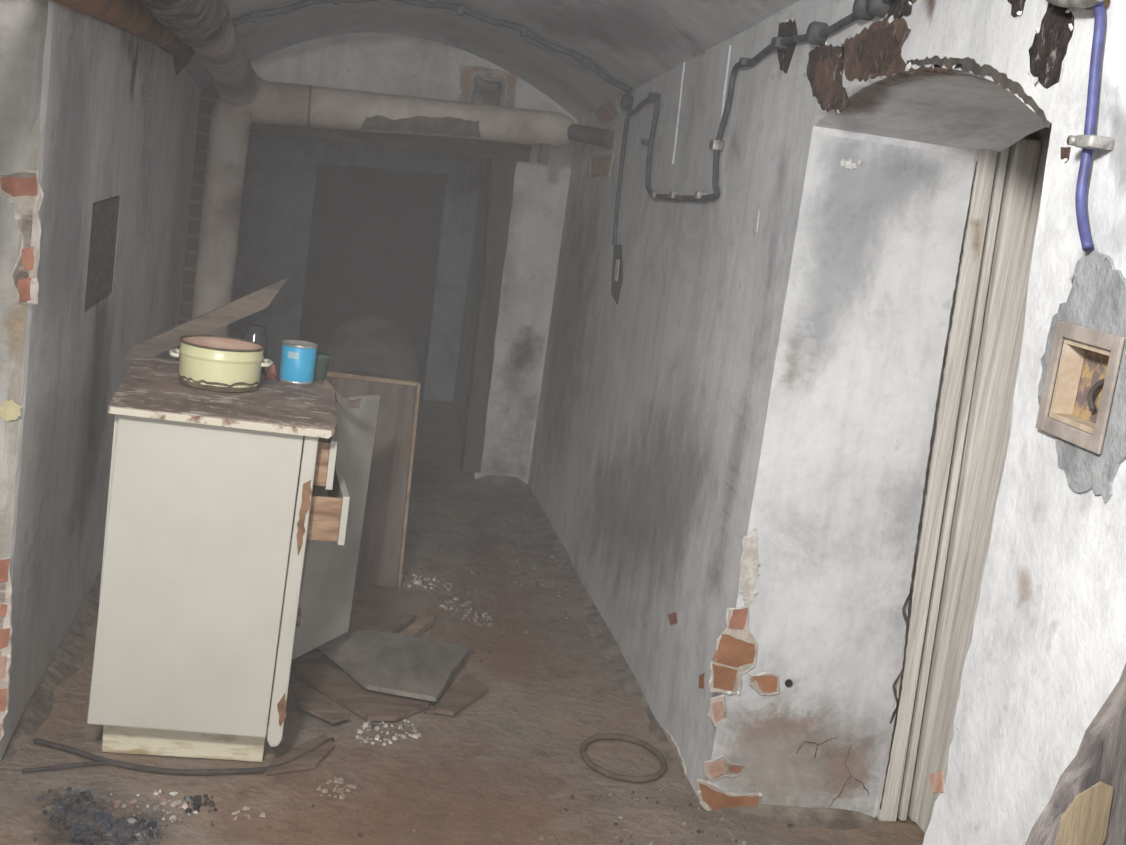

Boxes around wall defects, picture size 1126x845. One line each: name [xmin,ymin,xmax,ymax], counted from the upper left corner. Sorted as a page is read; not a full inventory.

flaking render [778,17,798,73]
peeling [804,0,962,114]
peeling [1007,0,1026,18]
peeling [1027,2,1074,89]
flaking render [0,170,44,305]
crack [796,161,977,809]
flaking render [0,557,13,745]
flaking render [699,528,793,727]
flaking render [661,725,762,811]